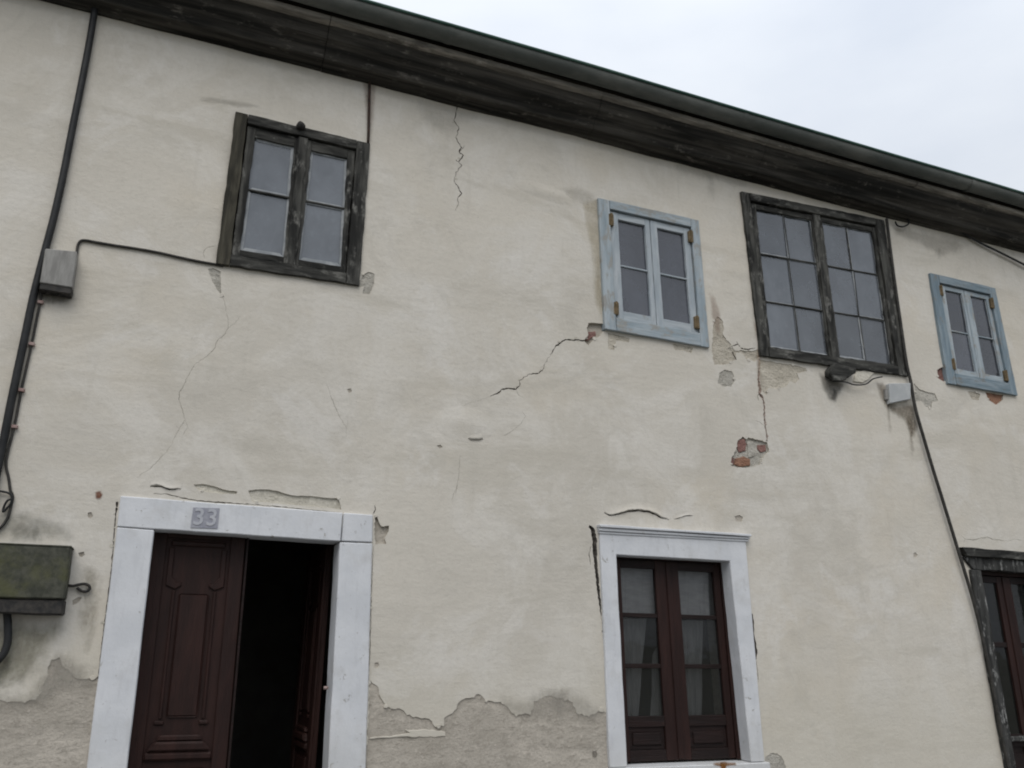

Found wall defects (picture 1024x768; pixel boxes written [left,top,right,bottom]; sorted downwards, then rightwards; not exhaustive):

crack [452,107,464,208]
flaking render [359,272,375,294]
crack [464,337,587,436]
crack [730,343,768,441]
flaking render [712,317,806,394]
flaking render [968,390,1002,405]
flaking render [150,477,341,510]
flaking render [374,514,388,544]
flaking render [730,436,768,468]
crack [589,525,603,632]
flaking render [0,657,98,768]
flaking render [366,682,610,768]